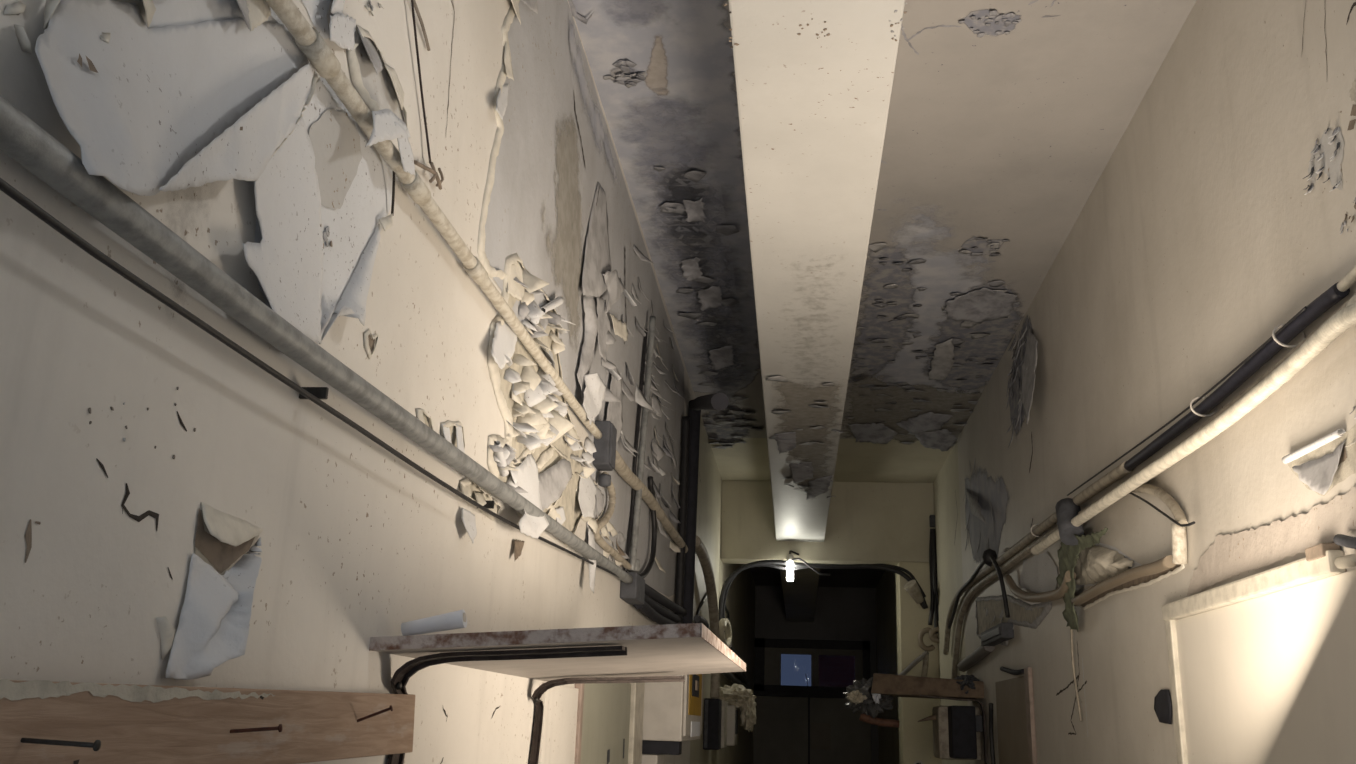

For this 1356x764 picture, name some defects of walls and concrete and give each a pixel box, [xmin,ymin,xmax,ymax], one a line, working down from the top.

peeling [14,0,416,359]